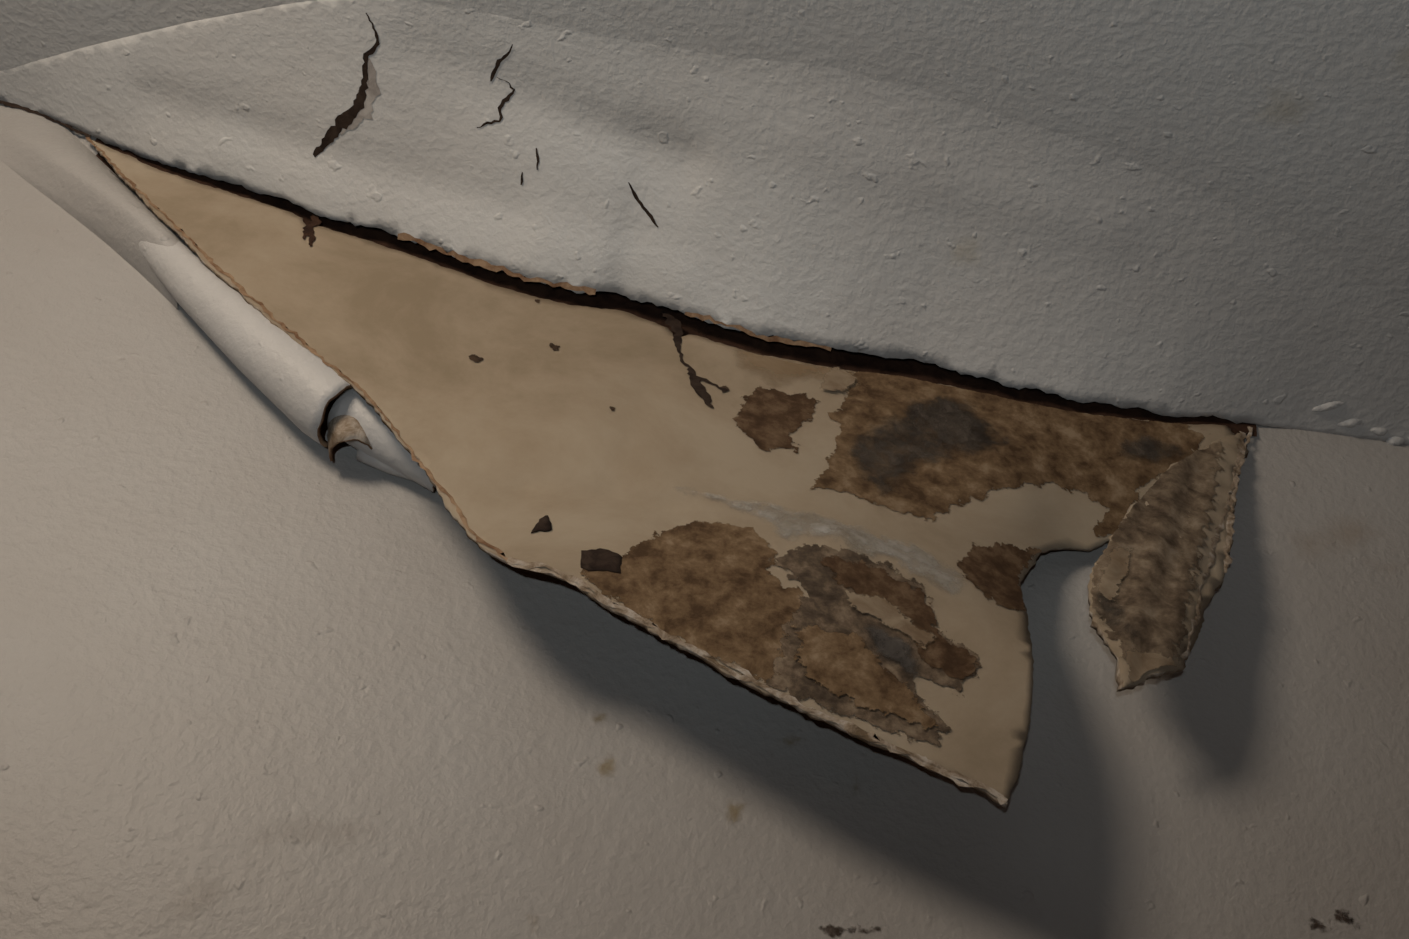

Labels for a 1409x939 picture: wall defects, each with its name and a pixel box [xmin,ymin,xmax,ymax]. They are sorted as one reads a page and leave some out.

crack [313,13,381,157]
crack [477,44,515,128]
peeling [0,103,1253,808]
water stain [732,351,1226,682]
water stain [580,520,981,746]